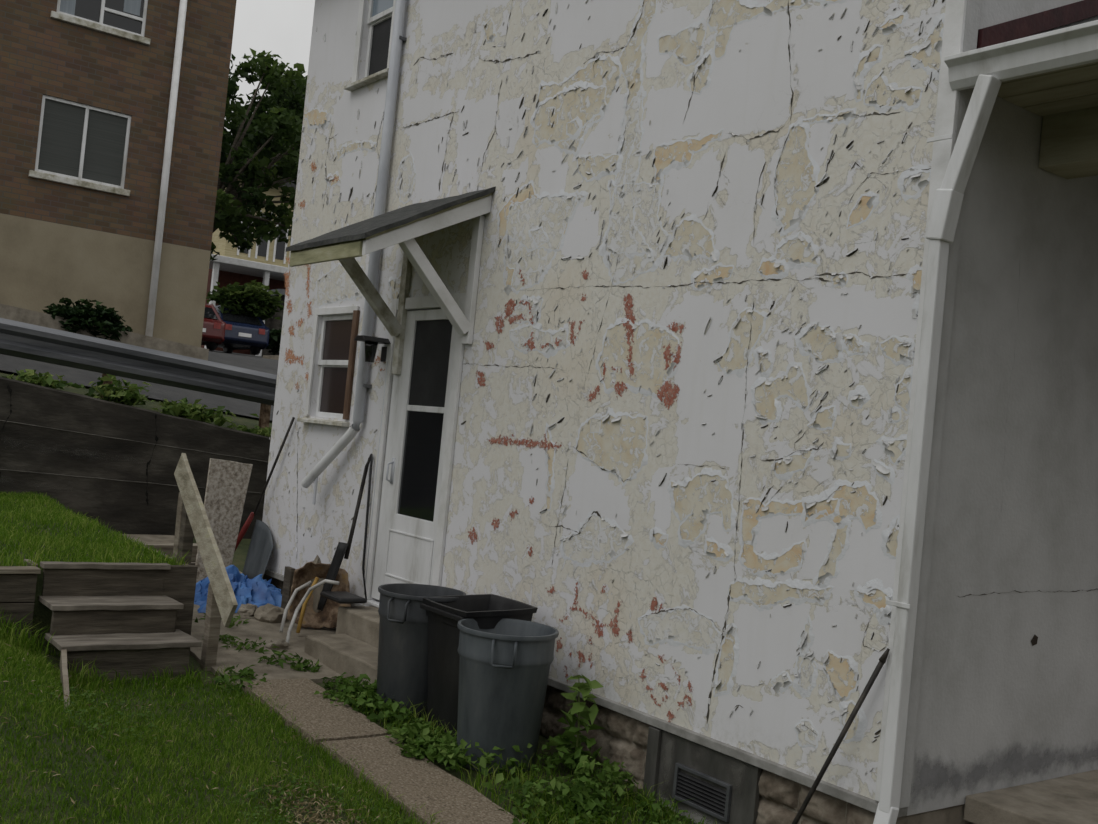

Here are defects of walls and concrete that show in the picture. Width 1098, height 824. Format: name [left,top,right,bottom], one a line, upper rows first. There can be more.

peeling [301,107,384,223]
crack [370,112,456,190]
crack [480,0,540,171]
crack [583,2,644,69]
peeling [464,0,849,403]
crack [705,0,794,237]
peeling [757,0,945,299]
crack [823,111,899,119]
peeling [316,262,363,308]
peeling [529,408,661,568]
crack [531,256,910,731]
peeling [629,604,741,697]